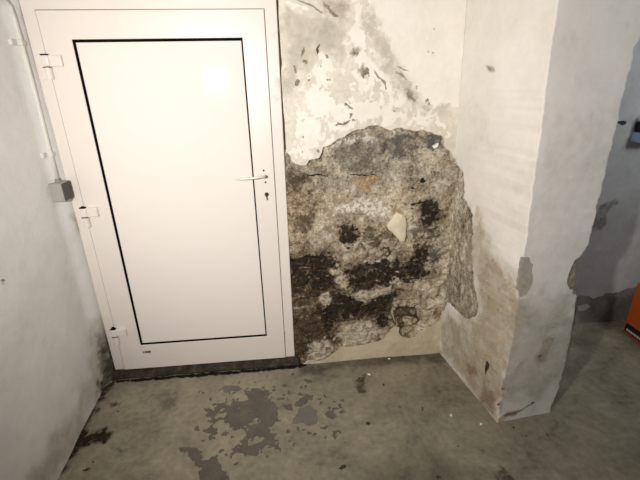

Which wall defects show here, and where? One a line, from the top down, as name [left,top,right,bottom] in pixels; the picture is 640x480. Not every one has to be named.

water stain [336,130,442,161]
spalling [284,0,482,368]
peeling [516,257,533,297]
peeling [567,259,636,324]
water stain [443,261,519,406]
water stain [97,340,115,401]
water stain [69,408,112,459]